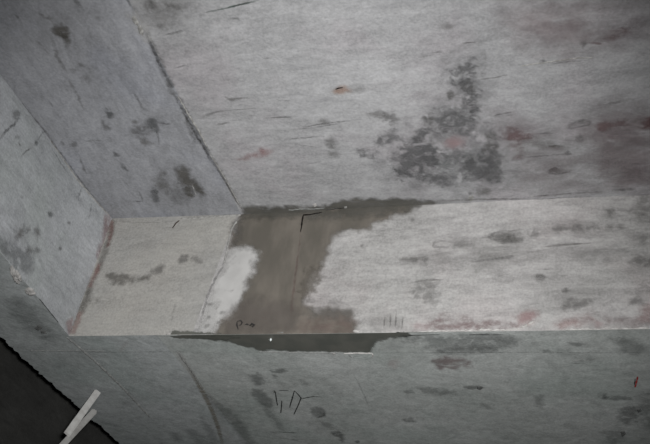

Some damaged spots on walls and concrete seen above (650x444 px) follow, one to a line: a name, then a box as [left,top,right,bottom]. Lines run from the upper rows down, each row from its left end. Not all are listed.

leakage [401,131,438,180]
leakage [177,168,204,196]
leakage [181,198,520,358]